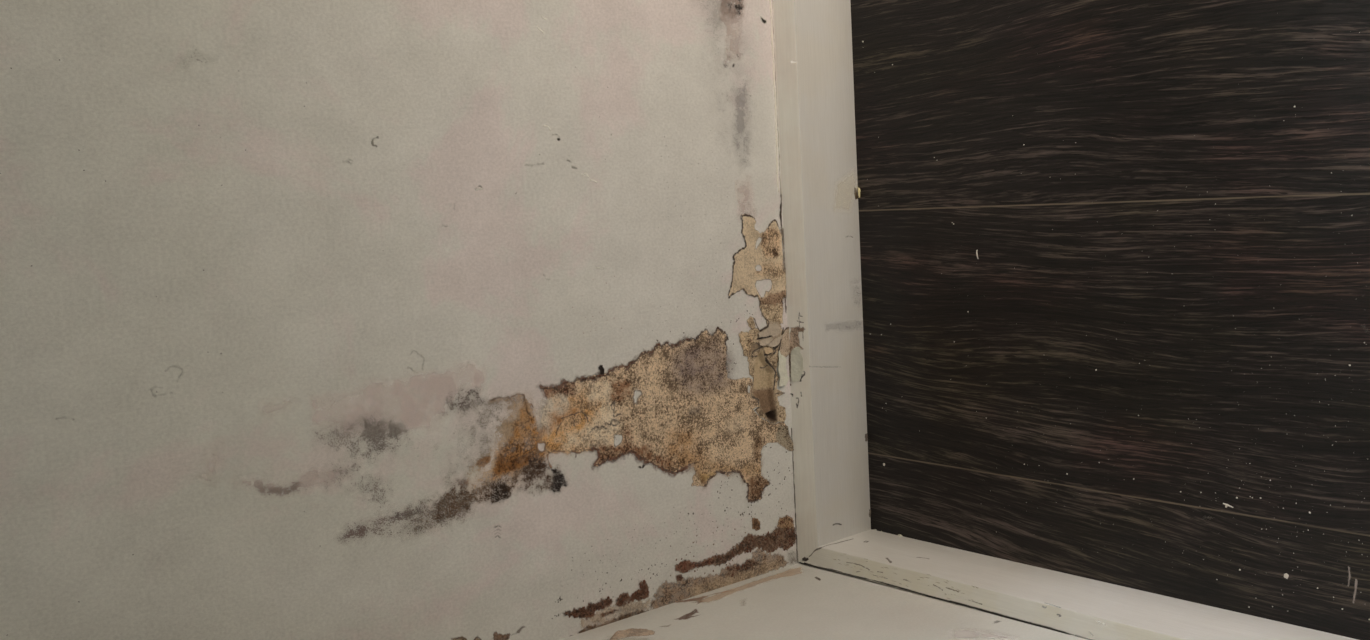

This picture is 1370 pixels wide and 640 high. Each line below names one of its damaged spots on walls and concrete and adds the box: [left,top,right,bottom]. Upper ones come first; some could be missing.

damp [703,0,750,162]
peeling [530,214,805,516]
damp [242,374,567,542]
peeling [452,626,525,640]